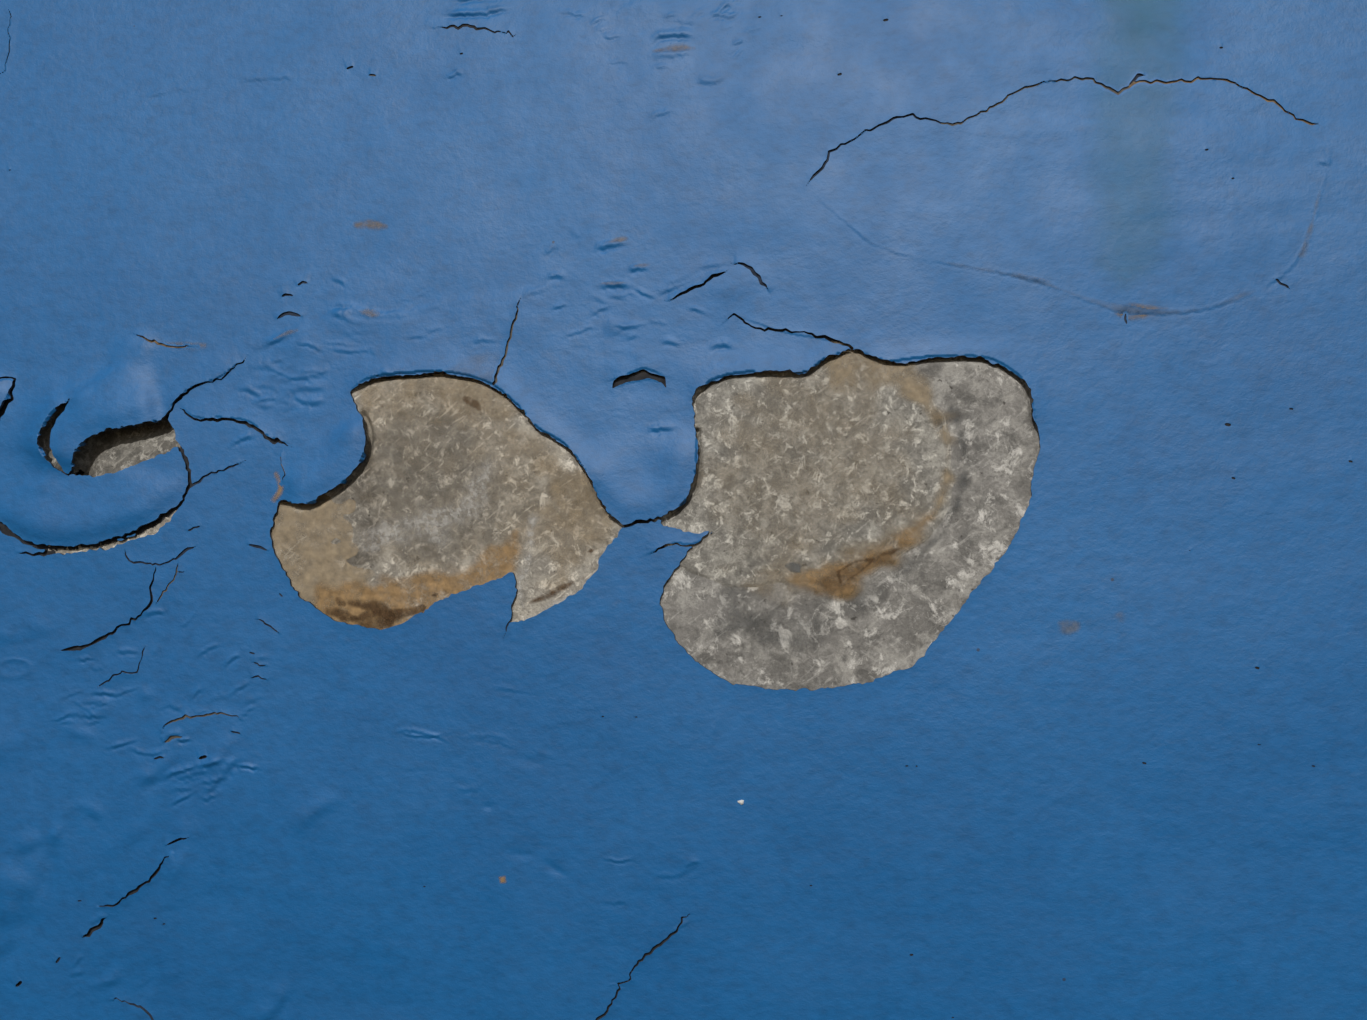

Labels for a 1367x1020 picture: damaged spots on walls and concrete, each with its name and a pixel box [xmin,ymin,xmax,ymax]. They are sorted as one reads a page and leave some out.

crack [805,73,1333,324]
peeling [0,313,1040,691]
crack [61,526,200,722]
crack [56,838,187,1020]
crack [596,914,689,1020]